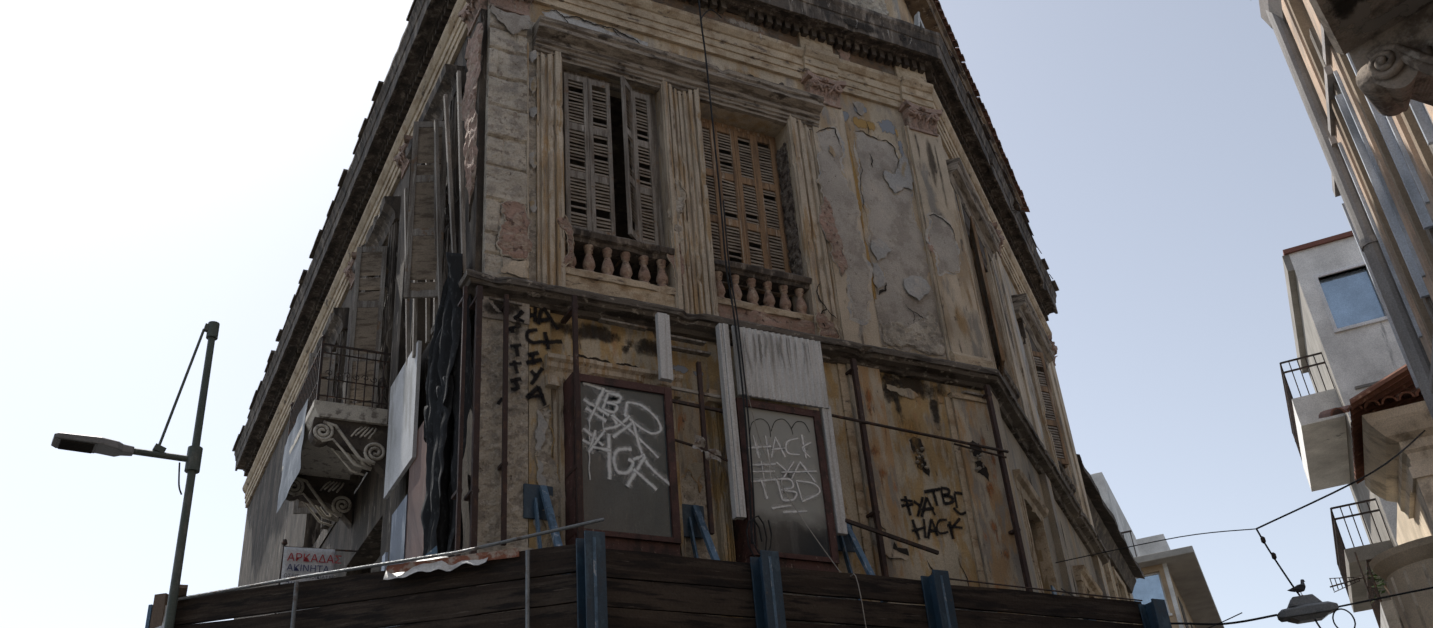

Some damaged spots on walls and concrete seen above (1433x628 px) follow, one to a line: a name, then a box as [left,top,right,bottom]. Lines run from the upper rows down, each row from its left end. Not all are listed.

flaking render [843,0,889,16]
flaking render [462,5,649,280]
flaking render [843,101,961,358]